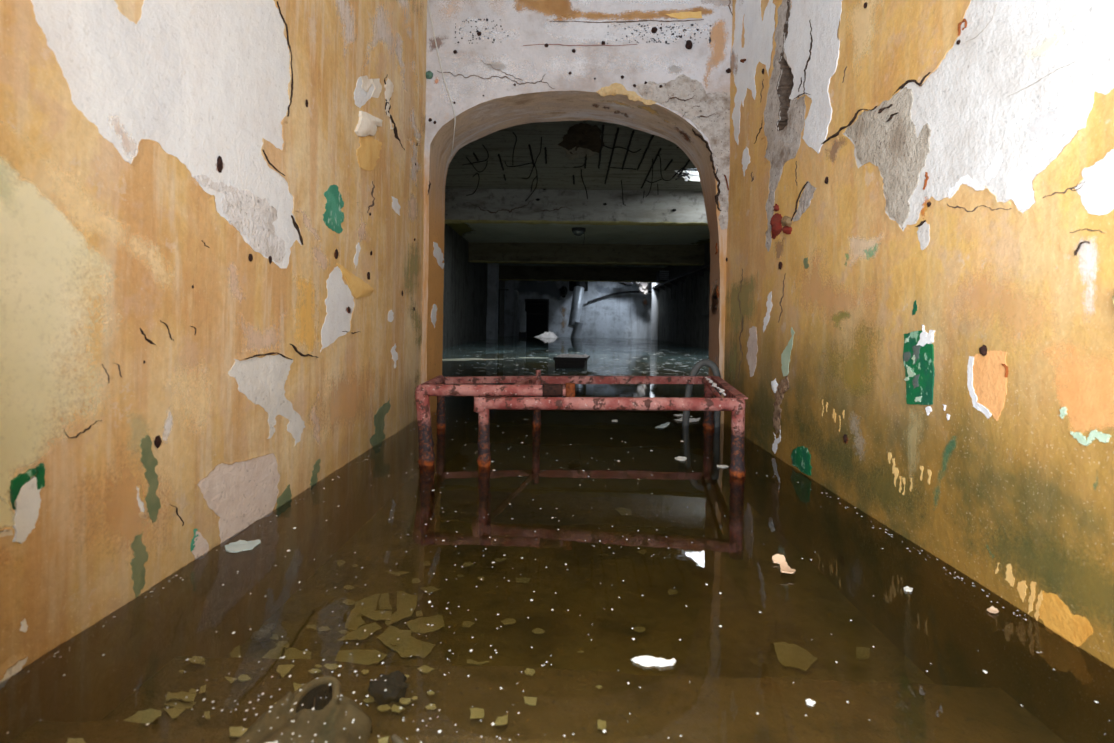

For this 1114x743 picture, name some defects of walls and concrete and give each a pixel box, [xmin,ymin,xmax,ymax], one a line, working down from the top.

crack [523,19,704,46]
peeling [514,0,714,21]
peeling [354,5,405,171]
crack [438,60,554,89]
flaking render [596,0,1114,265]
flaking render [31,0,374,352]
peeling [967,351,1007,421]
flaking render [190,347,305,560]
water stain [849,412,865,460]
water stain [908,413,922,471]
flaking render [0,463,46,544]
peeling [1039,590,1093,648]